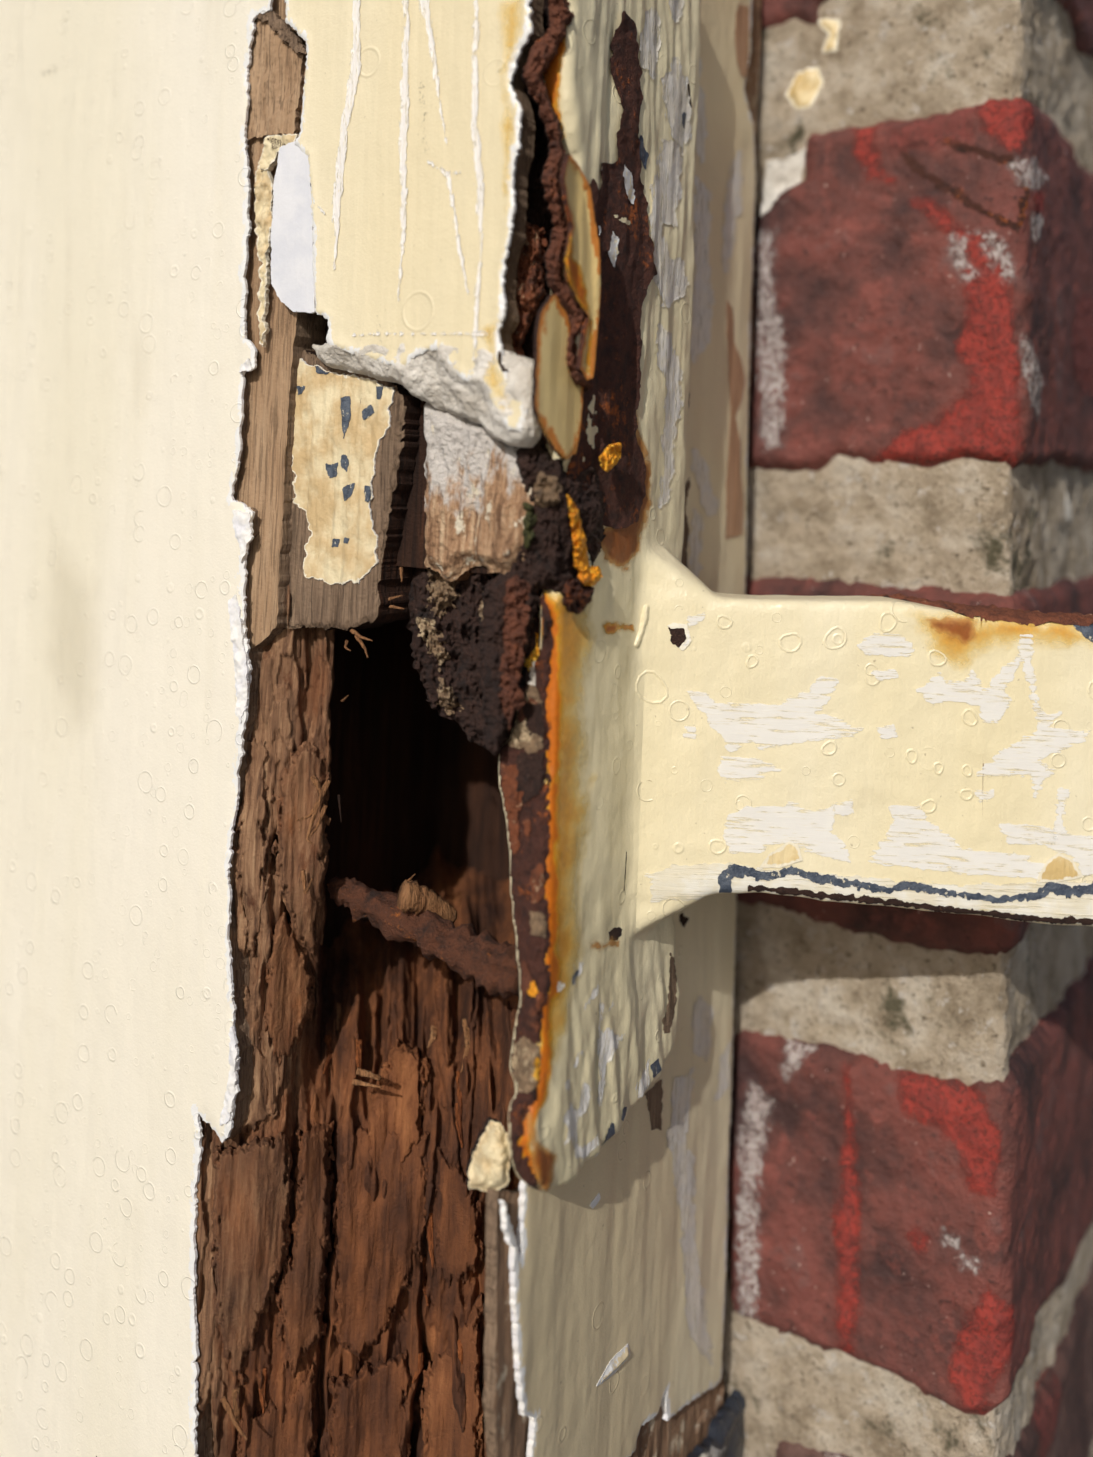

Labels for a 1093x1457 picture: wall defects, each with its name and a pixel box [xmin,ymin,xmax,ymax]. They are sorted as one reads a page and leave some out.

peeling [239,11,316,373]
spalling [282,154,601,755]
peeling [232,510,254,563]
peeling [228,594,250,723]
rust [479,0,657,1191]
peeling [667,623,691,651]
rust [857,593,1093,661]
spalling [397,880,457,923]
peeling [718,864,1093,903]
peeling [219,1026,239,1126]